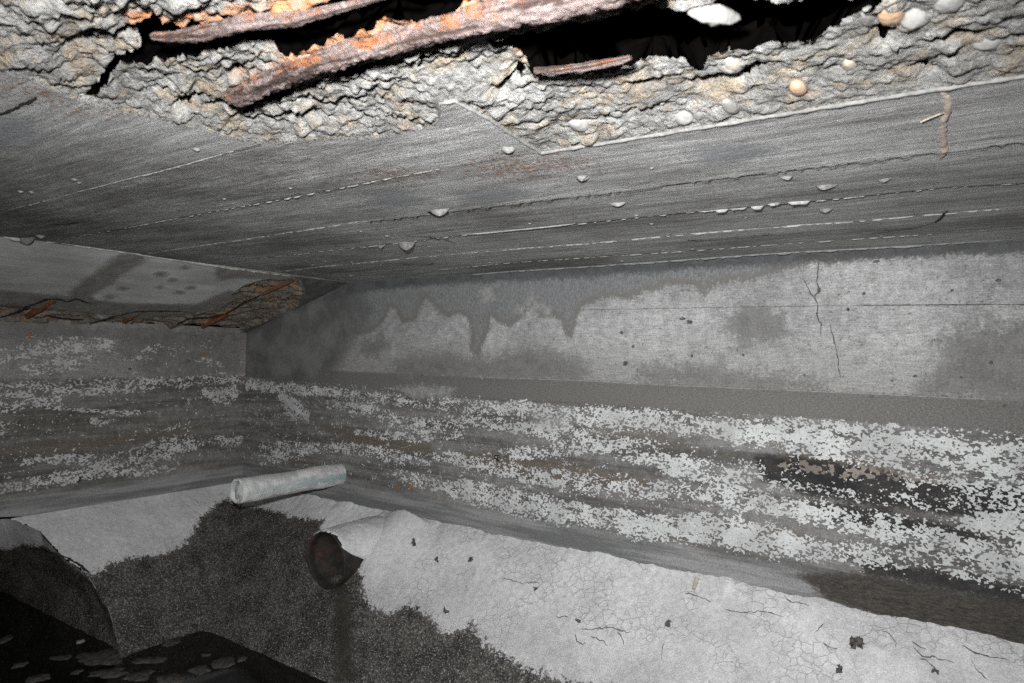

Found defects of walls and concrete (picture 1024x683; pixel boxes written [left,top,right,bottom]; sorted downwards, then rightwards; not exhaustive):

spalling [0,0,1024,155]
damp [0,240,1024,433]
crack [598,304,727,312]
crack [758,263,1024,377]
peeling [0,276,1024,597]
damp [756,455,1024,540]
damp [0,497,593,683]
crack [555,616,629,645]
crack [686,592,838,649]
crack [883,631,1008,679]